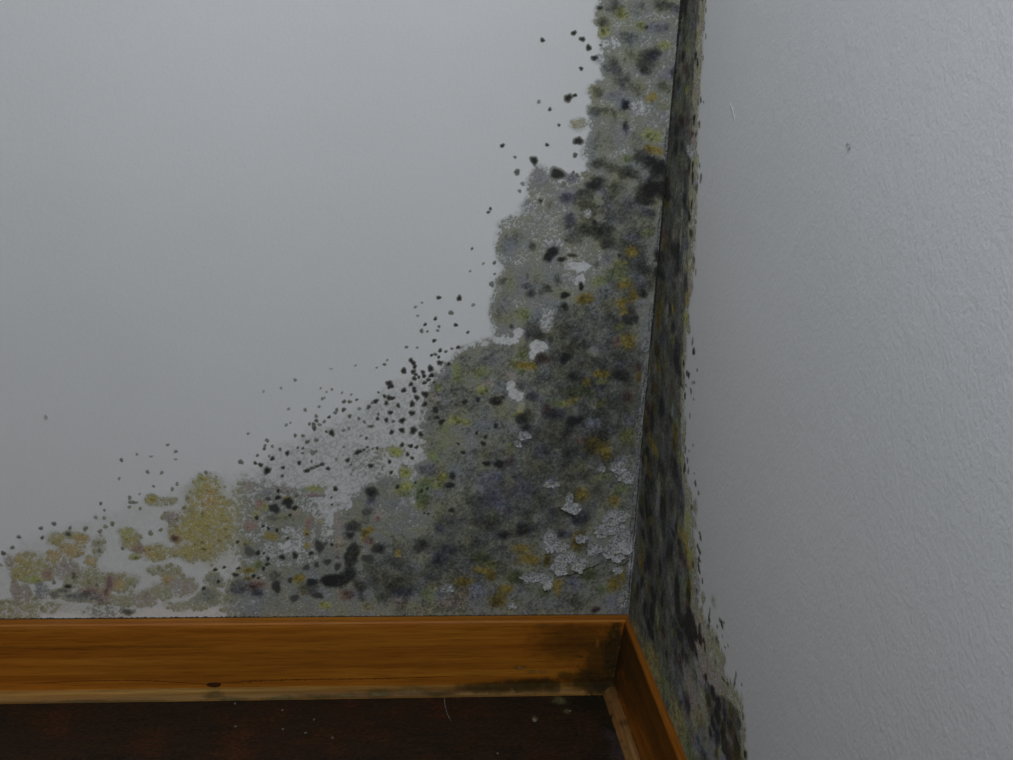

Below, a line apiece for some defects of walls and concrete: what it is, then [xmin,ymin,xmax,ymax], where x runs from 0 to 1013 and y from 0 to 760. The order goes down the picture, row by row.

damp [0,0,747,760]